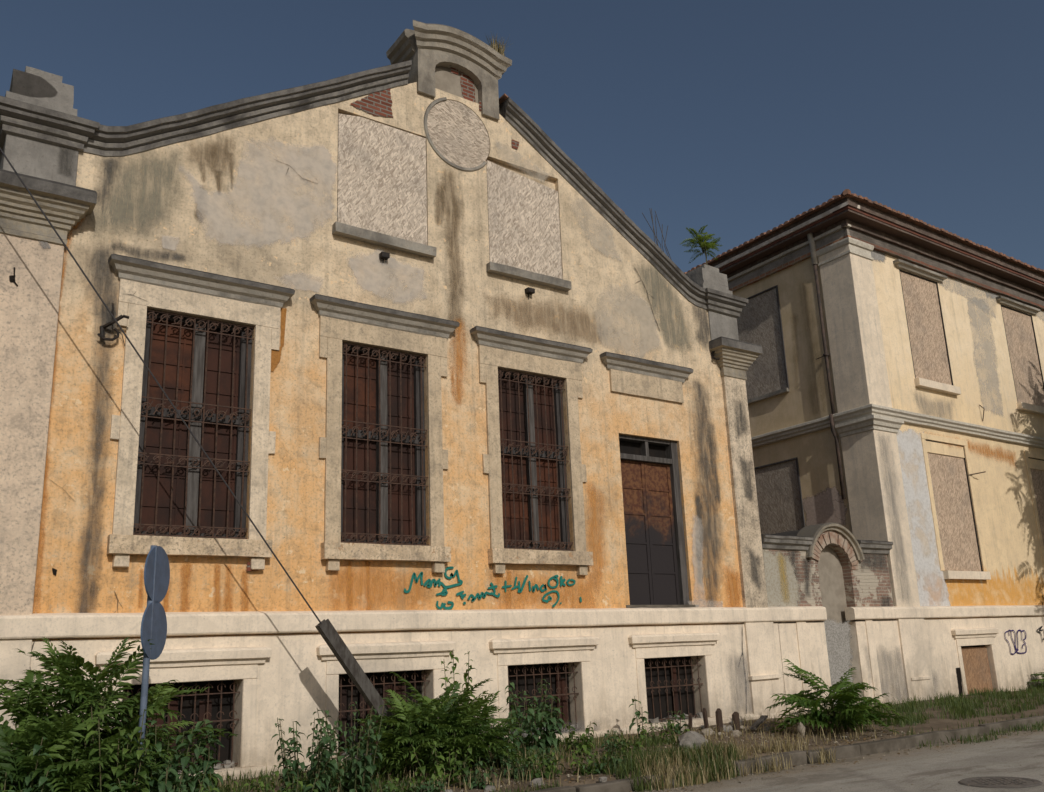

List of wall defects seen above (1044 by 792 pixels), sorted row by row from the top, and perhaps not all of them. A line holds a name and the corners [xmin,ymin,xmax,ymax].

spalling [350,88,393,117]
water stain [194,142,233,194]
water stain [437,174,461,323]
water stain [92,244,183,345]
water stain [737,403,746,435]
water stain [79,363,108,613]
water stain [696,384,720,607]
water stain [741,459,752,499]
rust [182,564,190,612]
rust [215,566,248,612]
water stain [751,553,760,587]
peeling [763,549,801,607]